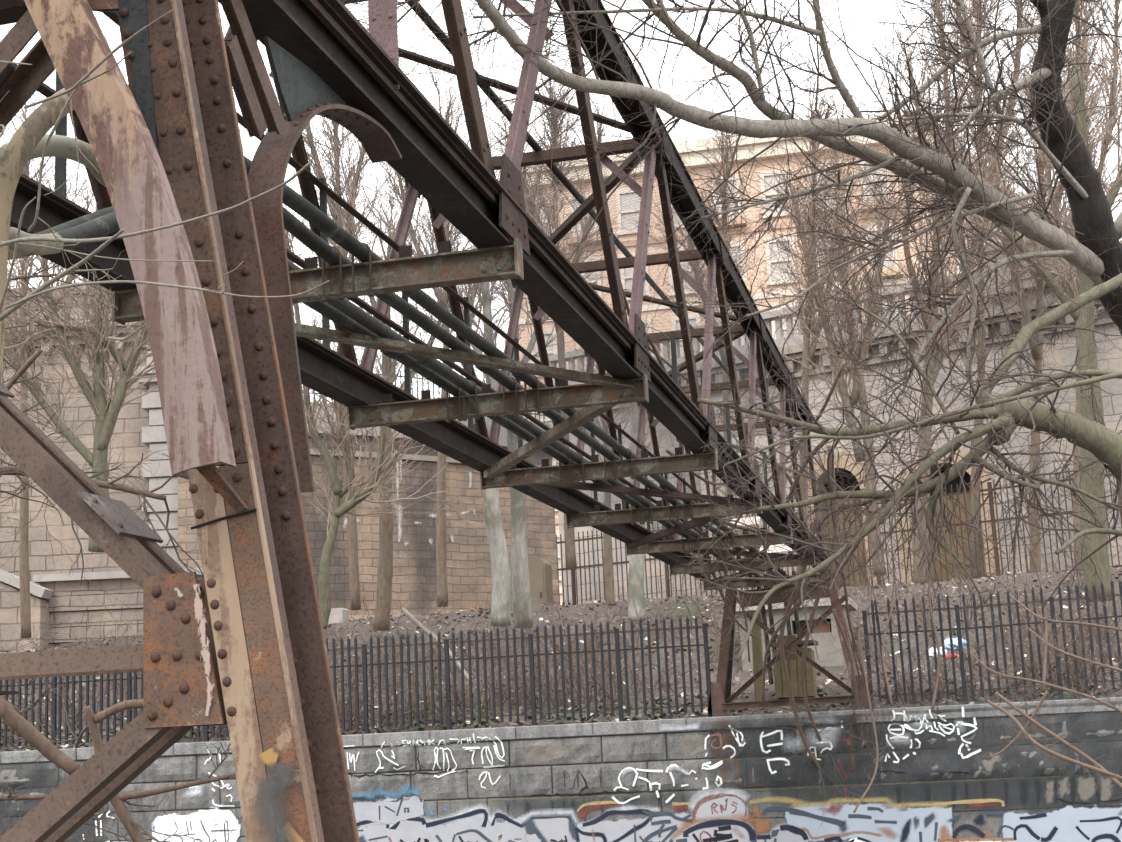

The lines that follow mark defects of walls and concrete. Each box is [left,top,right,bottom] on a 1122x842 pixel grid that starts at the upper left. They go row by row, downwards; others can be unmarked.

peeling [174,584,214,716]